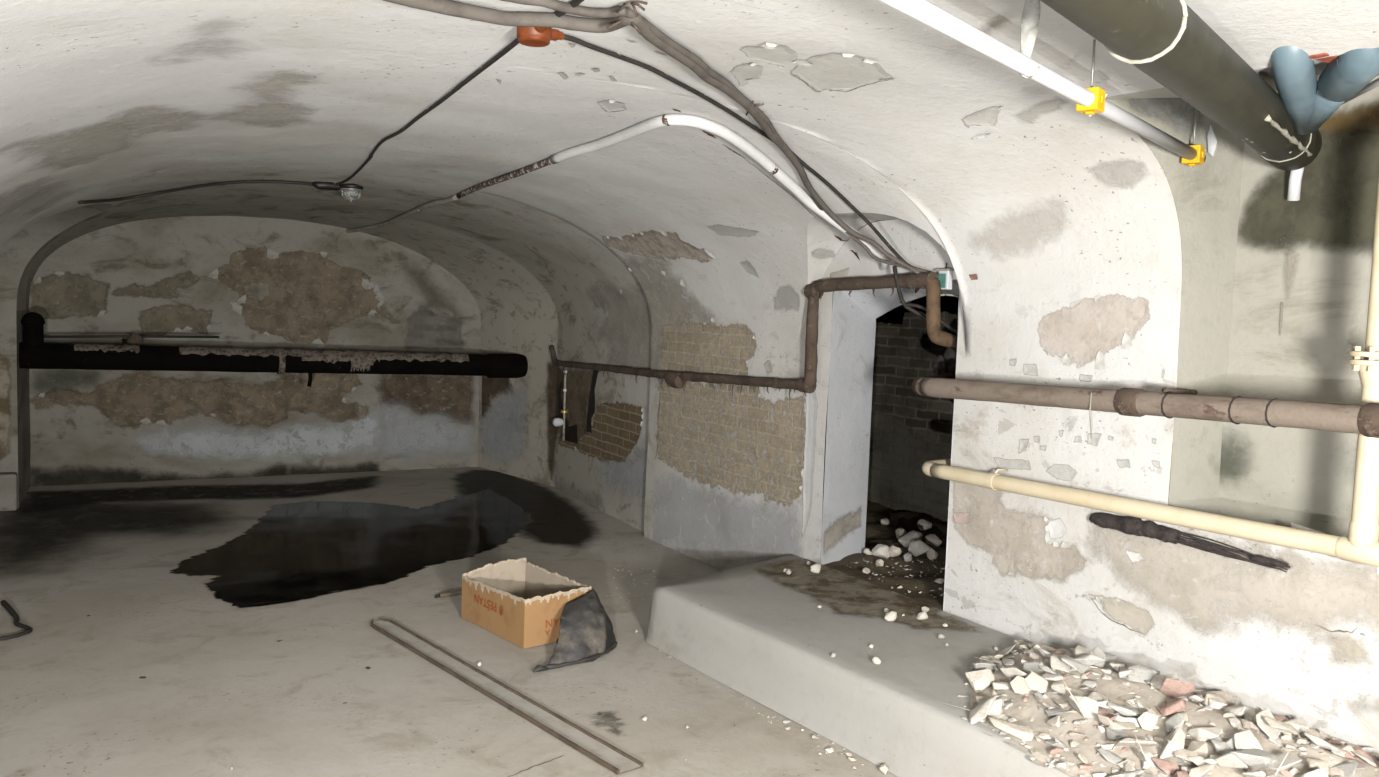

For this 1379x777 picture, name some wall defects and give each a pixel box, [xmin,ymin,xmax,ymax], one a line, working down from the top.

peeling [731,42,896,93]
peeling [30,247,384,348]
peeling [709,225,757,237]
peeling [812,249,849,279]
peeling [1009,294,1151,382]
damp [1239,125,1379,288]
peeling [0,355,11,459]
peeling [30,370,368,428]
flaking render [558,229,818,537]
peeling [994,436,1077,481]
flaking render [824,508,861,552]
peeling [953,481,1379,635]